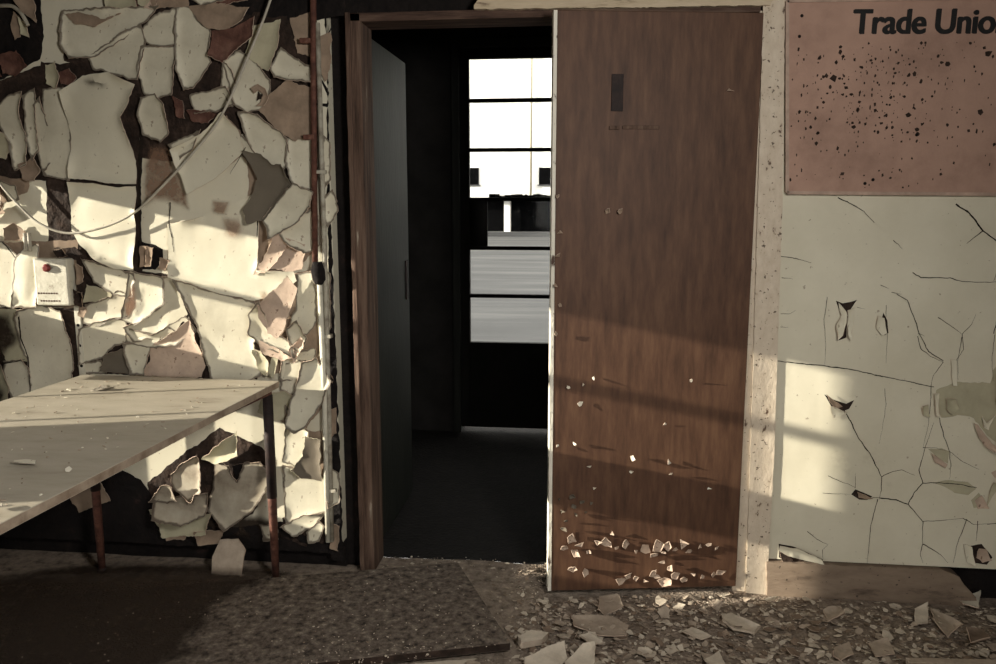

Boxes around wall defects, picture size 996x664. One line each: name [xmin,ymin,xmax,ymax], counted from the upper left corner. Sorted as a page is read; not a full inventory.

crack [955,203,996,242]
peeling [0,0,346,561]
crack [913,272,996,283]
peeling [836,300,857,341]
peeling [825,394,854,419]
crack [780,285,996,563]
peeling [922,360,996,453]
peeling [929,448,949,468]
peeling [933,470,996,509]
peeling [963,544,992,566]